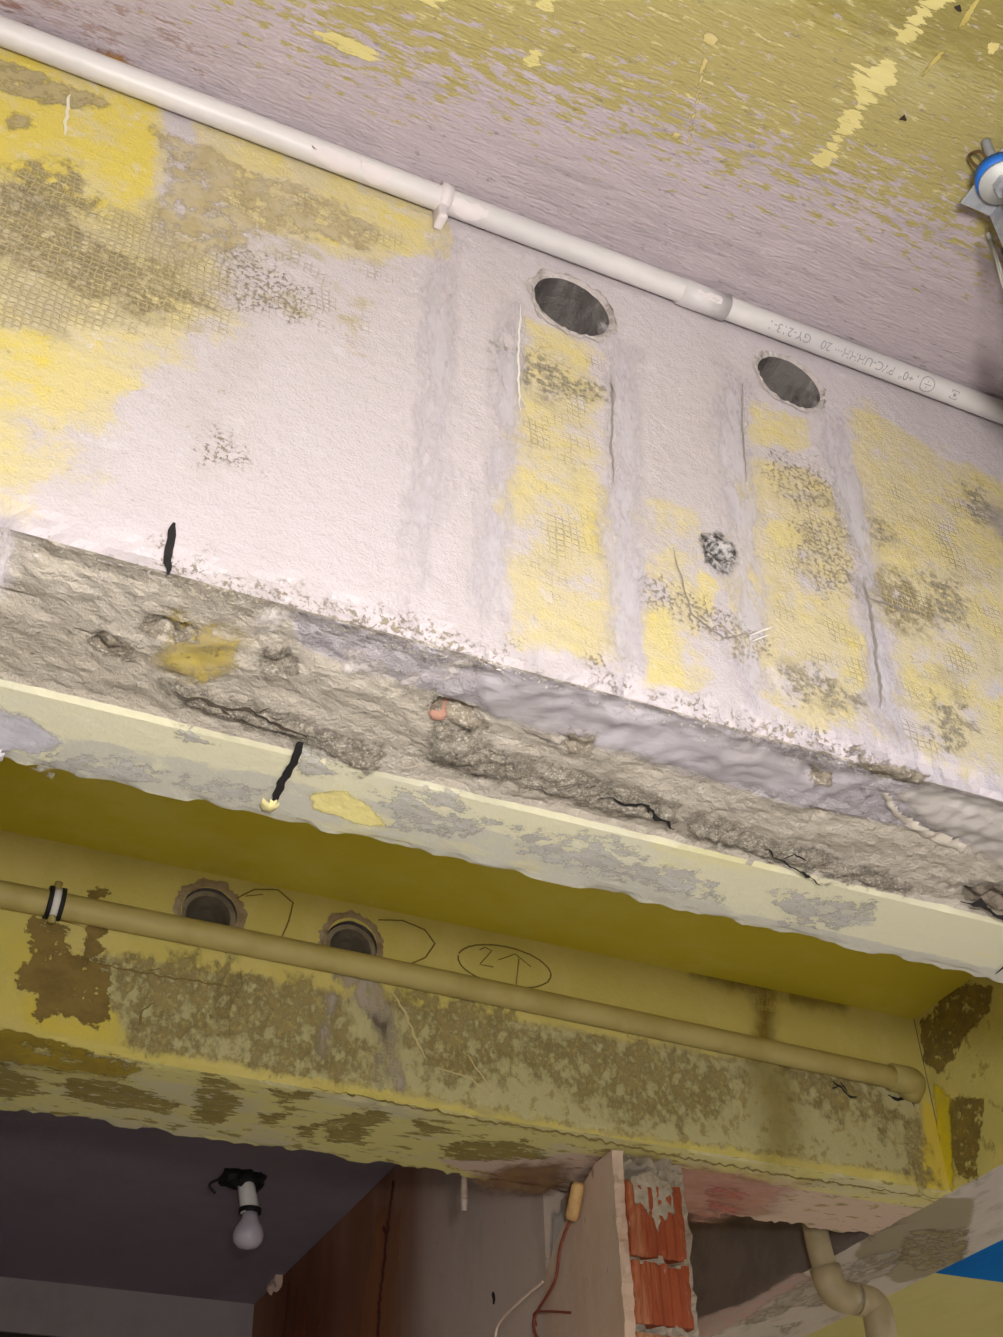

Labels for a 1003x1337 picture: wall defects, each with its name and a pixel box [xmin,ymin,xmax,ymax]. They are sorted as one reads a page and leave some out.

crack [173,691,307,801]
spalling [0,531,933,894]
peeling [924,691,973,752]
crack [600,797,674,830]
crack [764,849,819,885]
crack [960,898,1003,920]
spalling [963,883,1003,911]
peeling [0,910,392,1146]
peeling [388,990,747,1131]
peeling [920,983,993,1074]
peeling [411,1118,553,1162]
peeling [948,1094,984,1180]